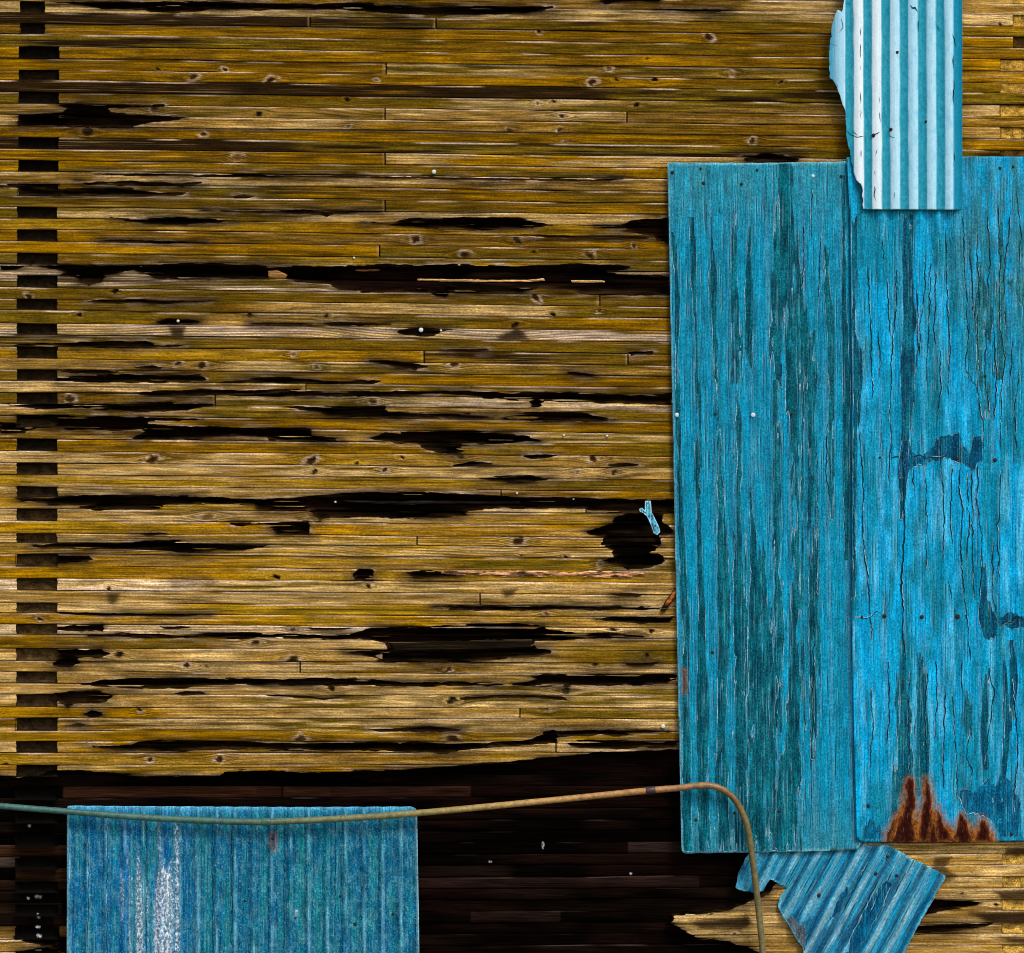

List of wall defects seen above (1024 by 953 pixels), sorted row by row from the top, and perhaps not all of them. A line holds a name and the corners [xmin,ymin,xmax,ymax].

crack [801,190,822,299]
crack [810,192,1024,812]
peeling [898,214,983,520]
peeling [863,640,930,840]
corrosion [886,776,995,842]
peeling [957,556,1024,839]